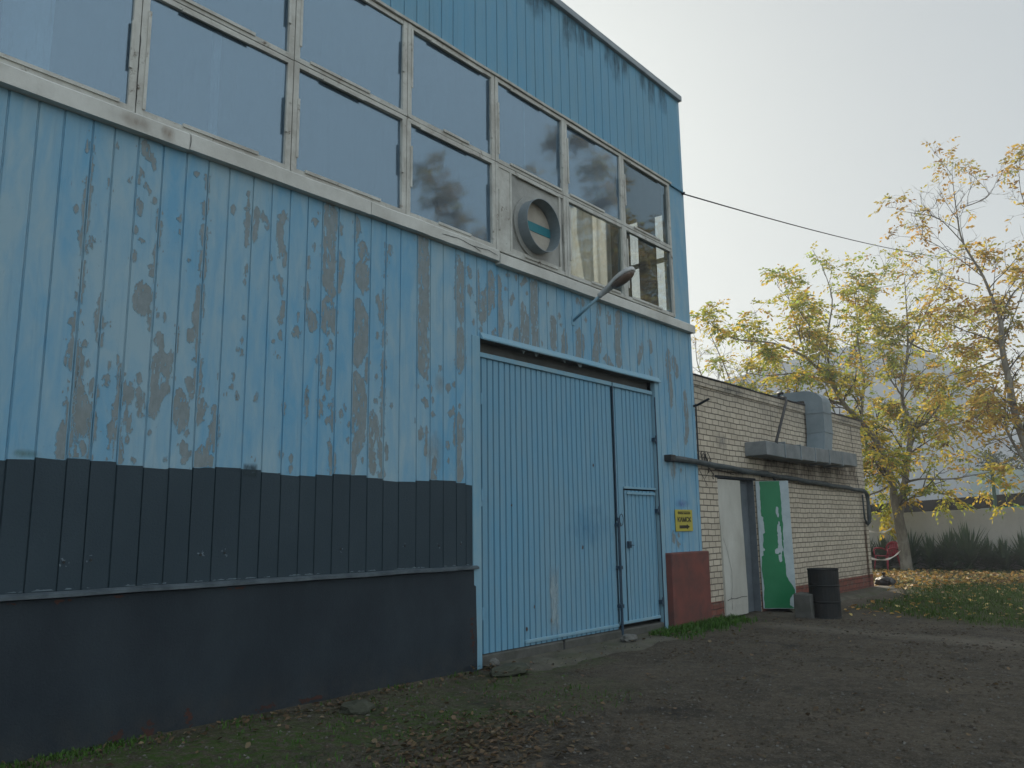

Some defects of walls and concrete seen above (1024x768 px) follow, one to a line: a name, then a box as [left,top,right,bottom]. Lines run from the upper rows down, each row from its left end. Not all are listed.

peeling [54,130,240,469]
peeling [230,190,393,479]
peeling [414,235,623,483]
peeling [665,347,689,445]
peeling [760,507,783,562]